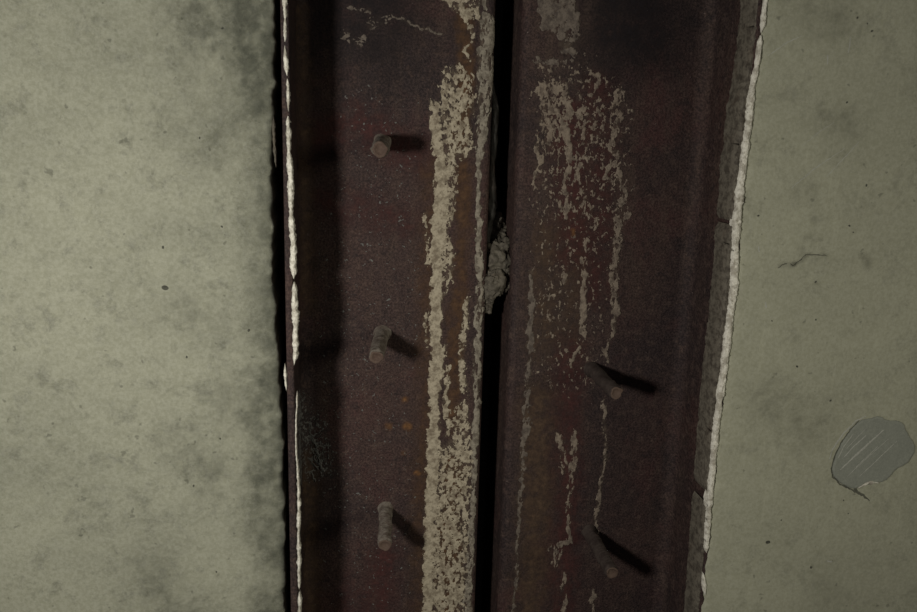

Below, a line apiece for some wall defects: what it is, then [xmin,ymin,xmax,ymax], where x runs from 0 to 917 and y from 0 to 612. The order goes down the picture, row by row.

rust [456,16,473,147]
peeling [832,416,915,489]
rust [440,523,460,611]